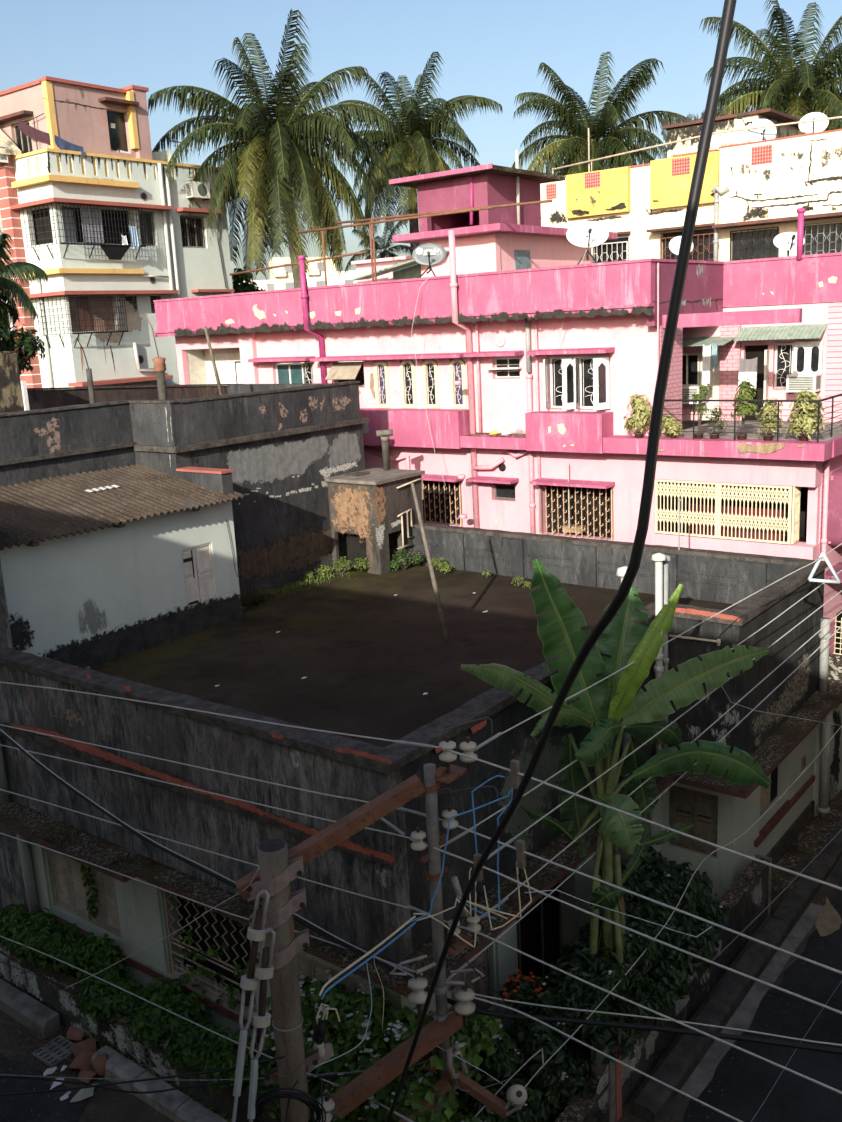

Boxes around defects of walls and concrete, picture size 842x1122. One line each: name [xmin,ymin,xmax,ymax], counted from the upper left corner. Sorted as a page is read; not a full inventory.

crack [728,139,842,220]
peeling [253,304,288,319]
water stain [0,351,24,409]
peeling [259,373,376,431]
peeling [34,417,61,454]
peeling [239,462,358,505]
water stain [9,483,387,668]
peeling [0,947,179,1087]